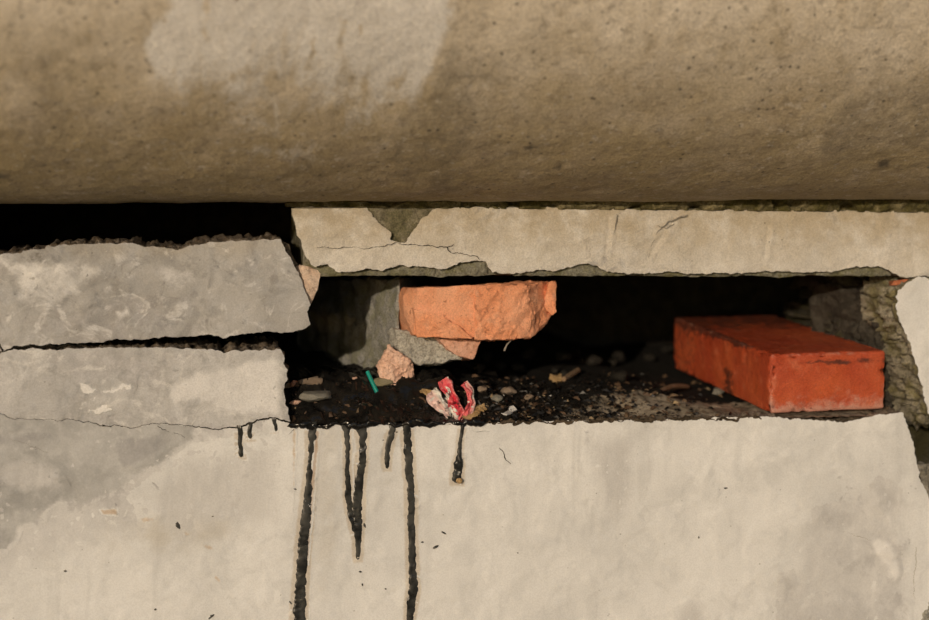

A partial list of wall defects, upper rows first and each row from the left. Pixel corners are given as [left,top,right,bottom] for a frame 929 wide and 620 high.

crack [317,242,479,259]
crack [0,344,83,353]
crack [0,413,290,460]